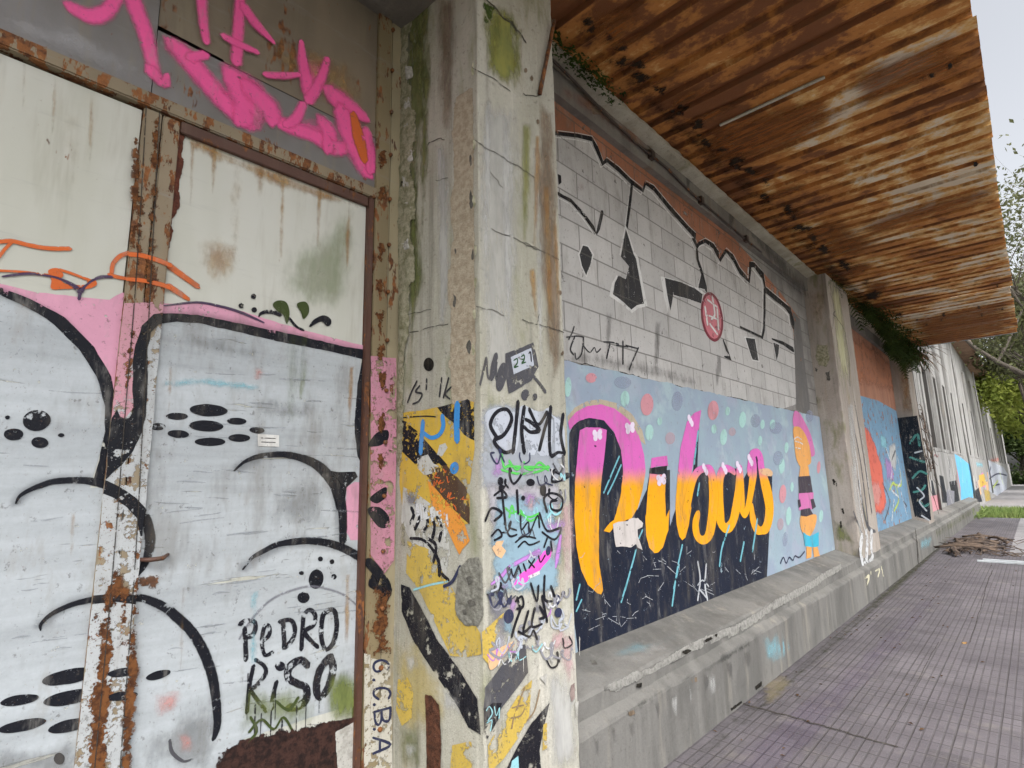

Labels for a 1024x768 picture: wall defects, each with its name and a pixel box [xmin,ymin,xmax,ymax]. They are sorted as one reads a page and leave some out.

corrosion [852,42,958,103]
corrosion [129,118,159,308]
spalling [397,21,416,473]
corrosion [868,191,987,233]
corrosion [917,303,1008,345]
corrosion [371,587,391,657]
corrosion [87,571,159,768]